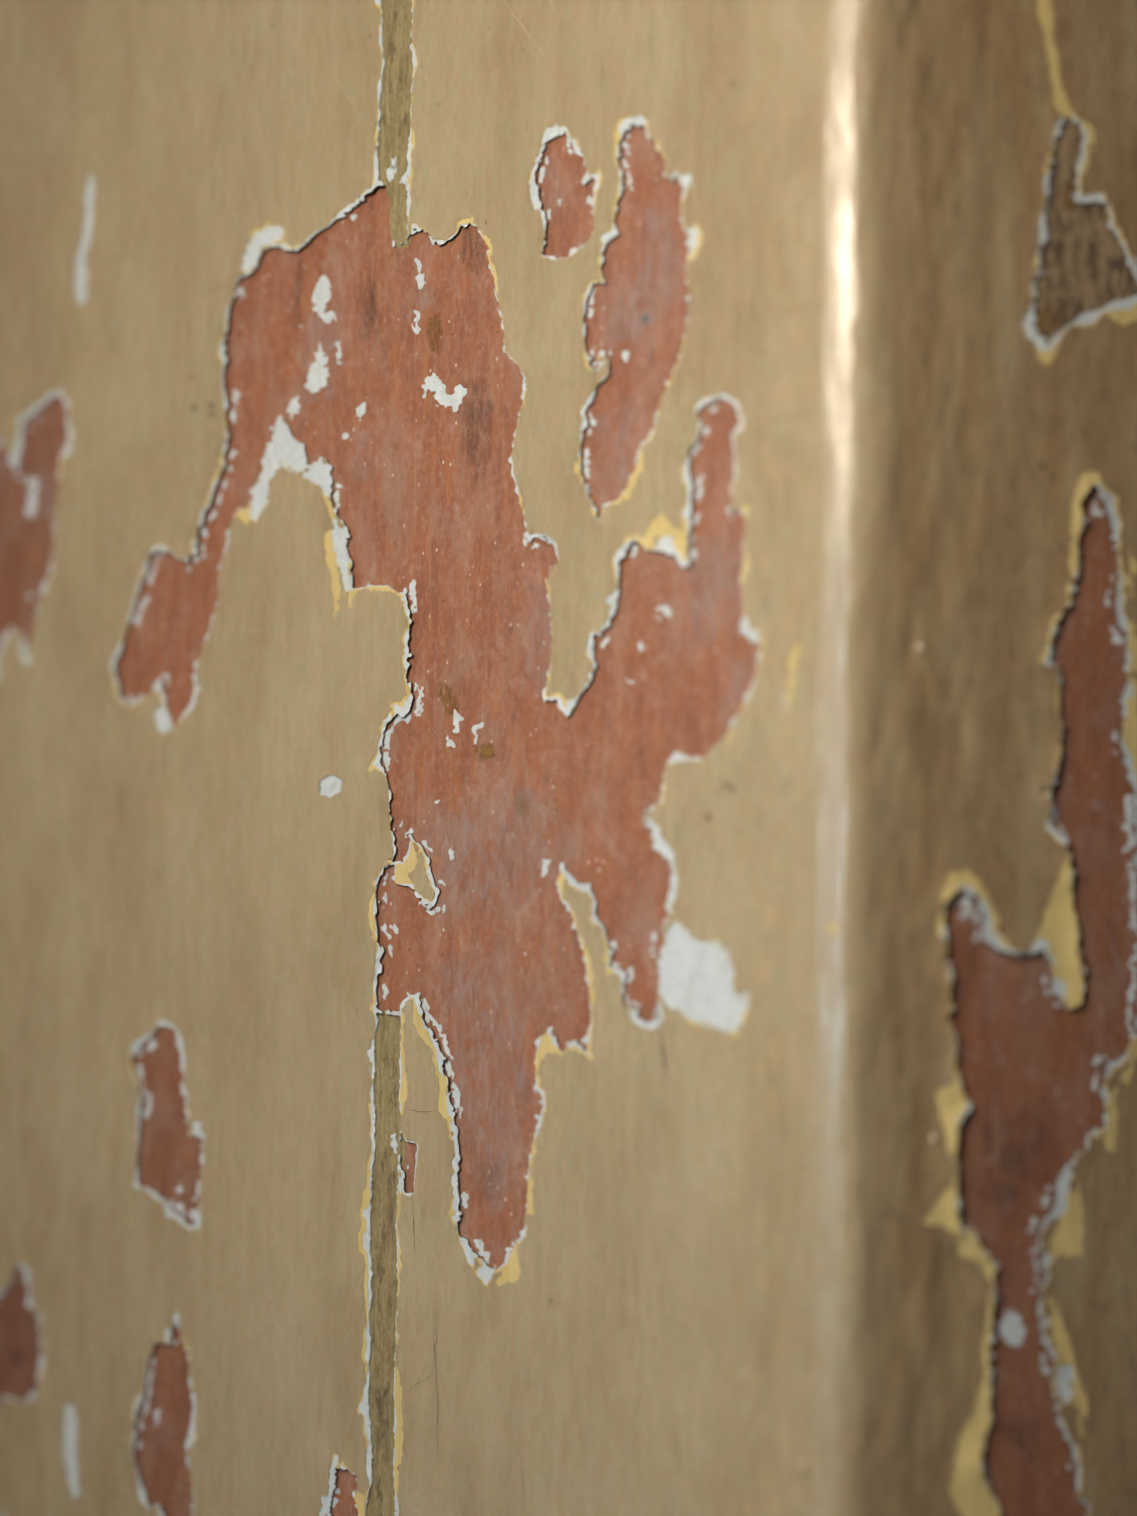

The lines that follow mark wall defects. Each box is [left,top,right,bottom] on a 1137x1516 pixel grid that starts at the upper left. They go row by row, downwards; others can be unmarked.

peeling [1021,0,1137,365]
peeling [0,389,75,666]
peeling [109,115,766,1287]
peeling [919,470,1137,1516]
peeling [0,1263,45,1405]
peeling [129,1311,199,1516]
peeling [318,1453,366,1516]